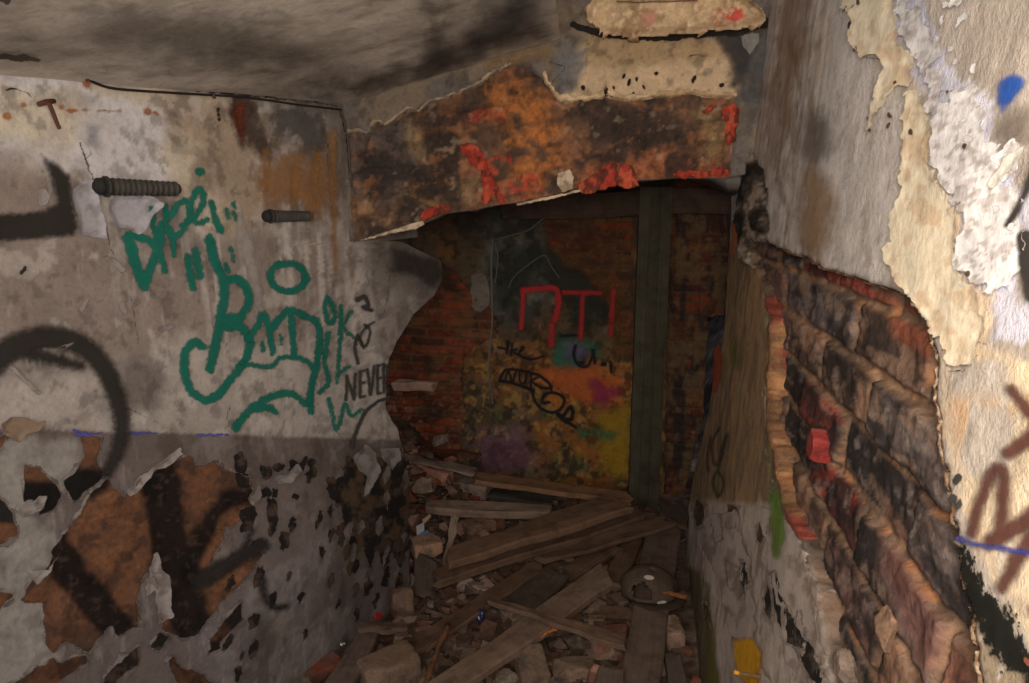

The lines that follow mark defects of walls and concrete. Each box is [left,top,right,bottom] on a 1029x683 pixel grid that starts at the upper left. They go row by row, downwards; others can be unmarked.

water stain [231,94,327,160]
peeling [73,180,164,240]
water stain [236,213,264,324]
spalling [344,0,1026,683]
peeling [0,417,46,451]
peeling [0,435,411,683]